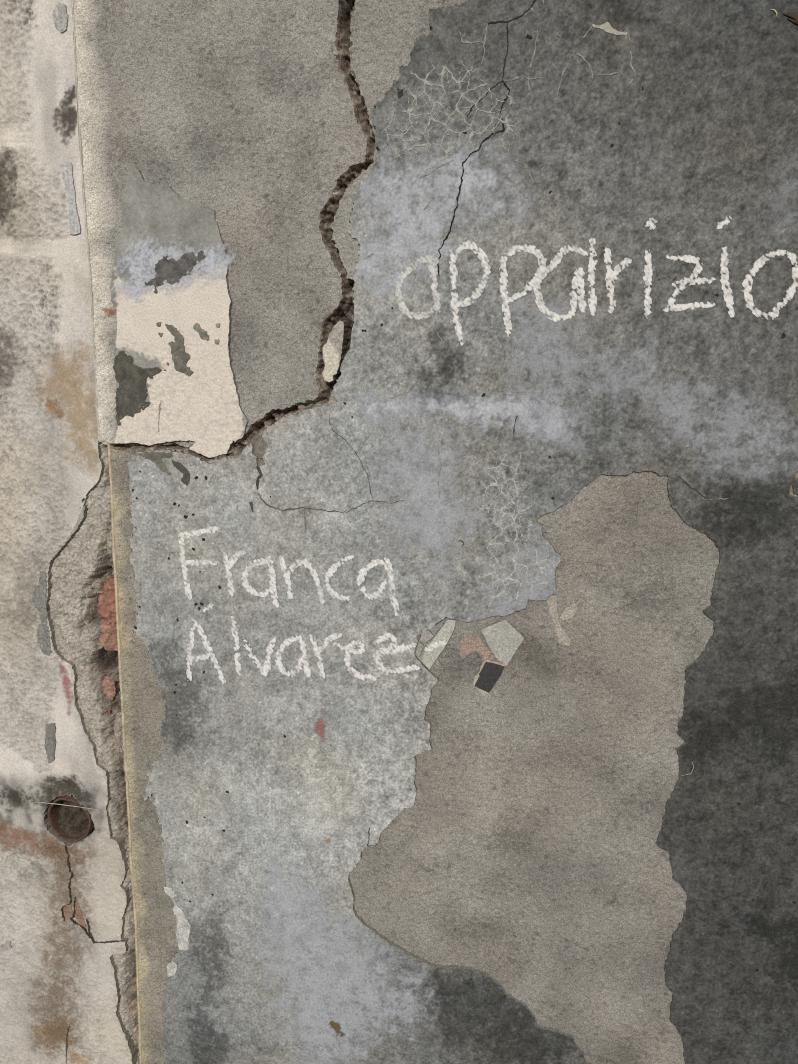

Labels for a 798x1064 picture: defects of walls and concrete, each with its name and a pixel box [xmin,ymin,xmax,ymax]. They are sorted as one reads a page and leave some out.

peeling [53,0,468,486]
crack [100,0,635,530]
flaking render [45,723,56,763]
flaking render [31,505,88,656]
crack [61,846,124,944]
peeling [349,471,720,1064]